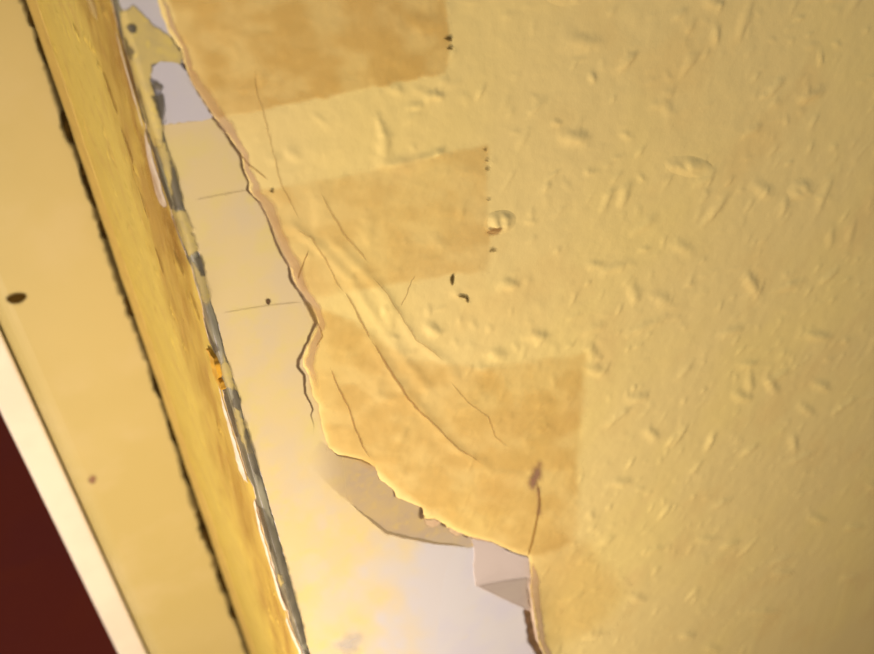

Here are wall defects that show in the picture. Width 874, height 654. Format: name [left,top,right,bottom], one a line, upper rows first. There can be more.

peeling [124,24,136,59]
flaking render [118,0,172,38]
flaking render [151,61,213,125]
peeling [148,134,183,210]
peeling [195,257,205,276]
peeling [223,389,259,476]
crack [529,484,541,553]
peeling [259,508,308,654]
flaking render [436,537,535,654]